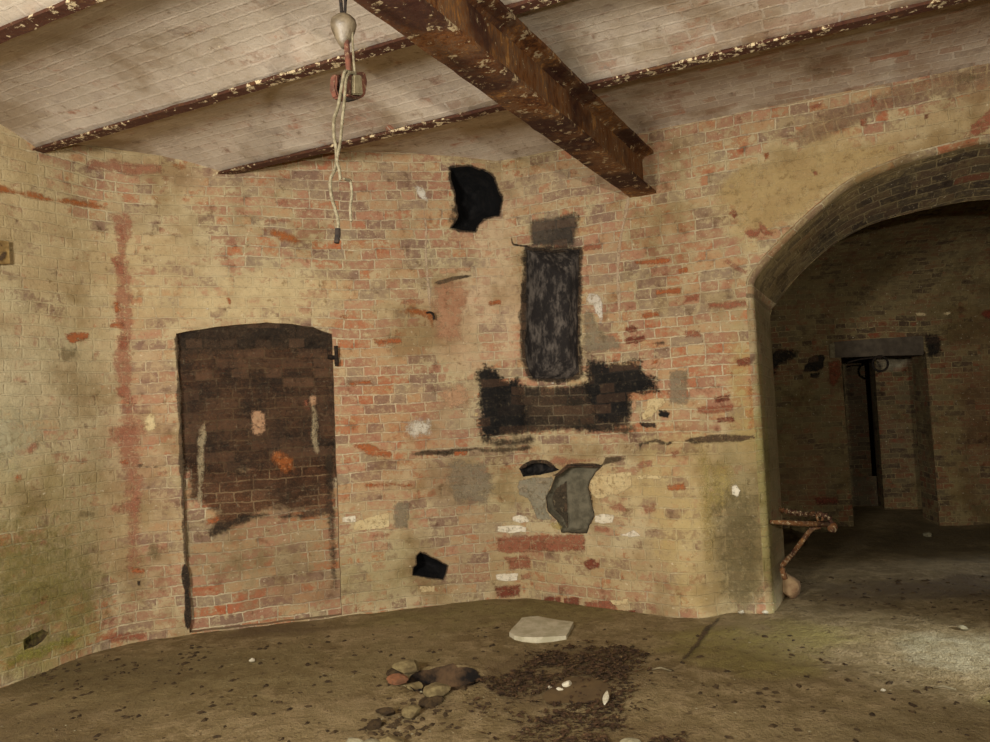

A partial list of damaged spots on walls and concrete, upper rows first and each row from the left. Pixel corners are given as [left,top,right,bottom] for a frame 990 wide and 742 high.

hole [448,164,503,233]
leakage [198,424,206,502]
leakage [210,515,263,536]
leakage [283,396,335,579]
hole [412,552,449,580]
flaking render [495,457,651,598]